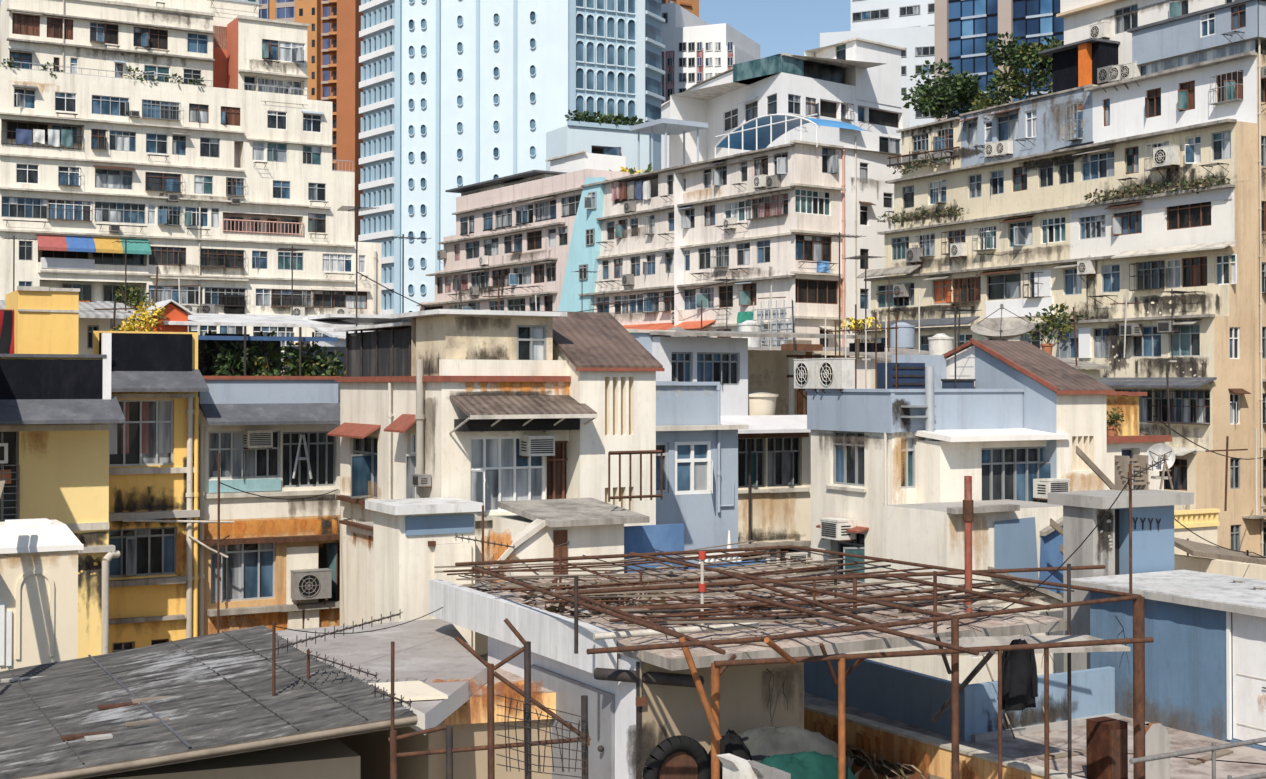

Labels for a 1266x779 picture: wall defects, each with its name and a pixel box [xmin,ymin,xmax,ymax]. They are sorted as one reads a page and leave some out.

water stain [74,453,194,610]
rust [204,516,337,539]
rust [484,531,511,574]
rust [243,612,287,631]
rust [319,608,340,627]
rust [434,679,542,712]